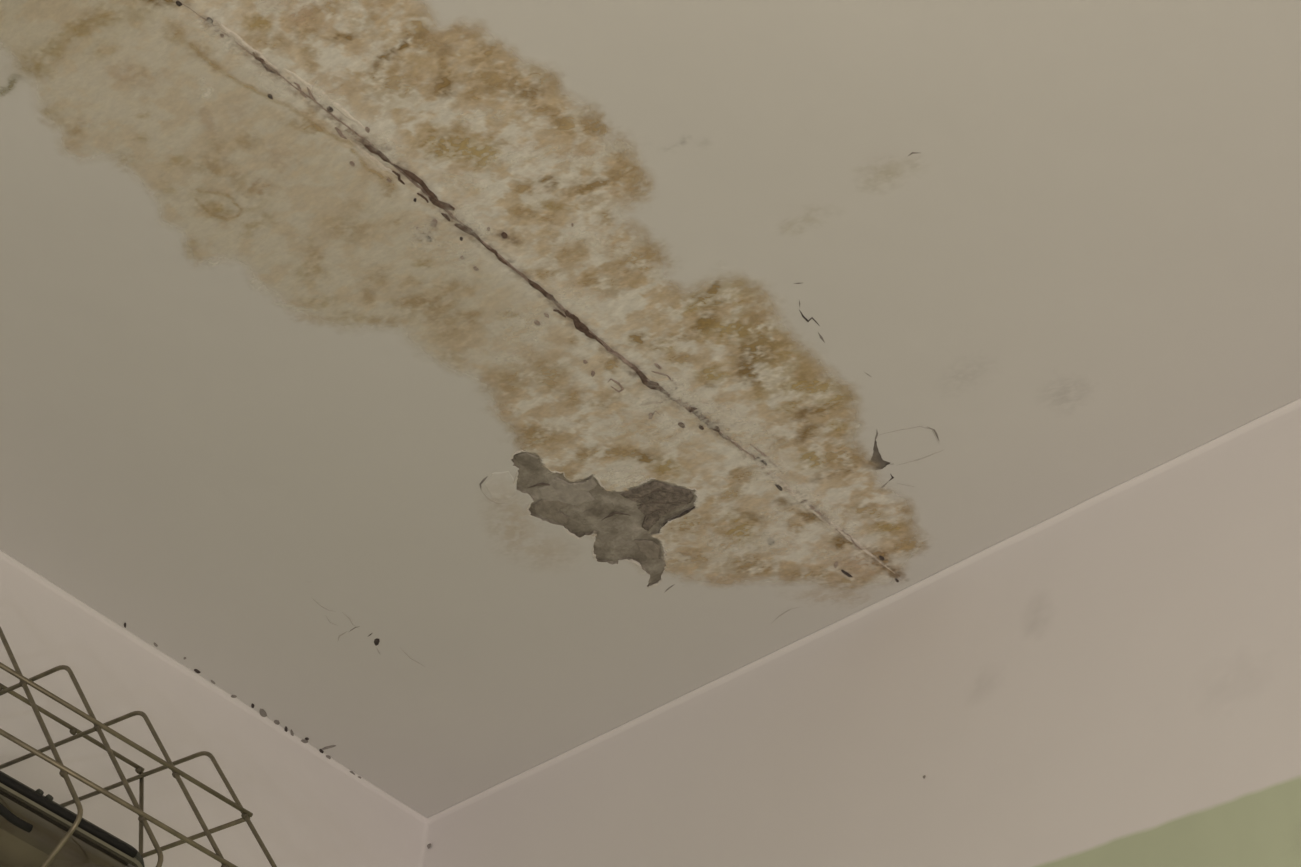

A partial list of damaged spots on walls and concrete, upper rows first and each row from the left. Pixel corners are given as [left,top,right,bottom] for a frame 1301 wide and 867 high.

water stain [0,0,916,587]
crack [176,0,900,582]
spalling [510,450,699,589]